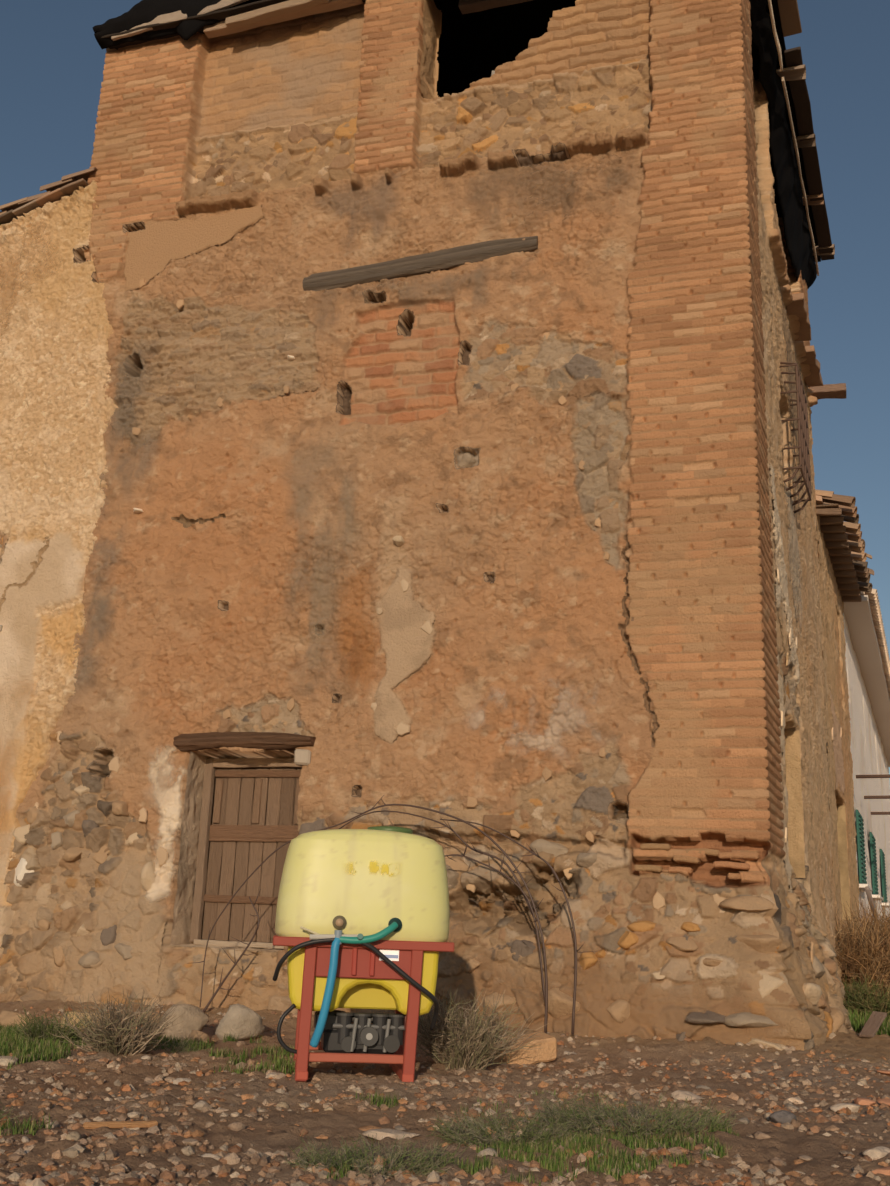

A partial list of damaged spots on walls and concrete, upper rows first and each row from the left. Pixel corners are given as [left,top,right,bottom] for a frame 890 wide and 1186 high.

peeling [371,565,436,744]
crack [618,535,660,747]
spalling [0,729,173,1005]
spalling [340,734,768,888]